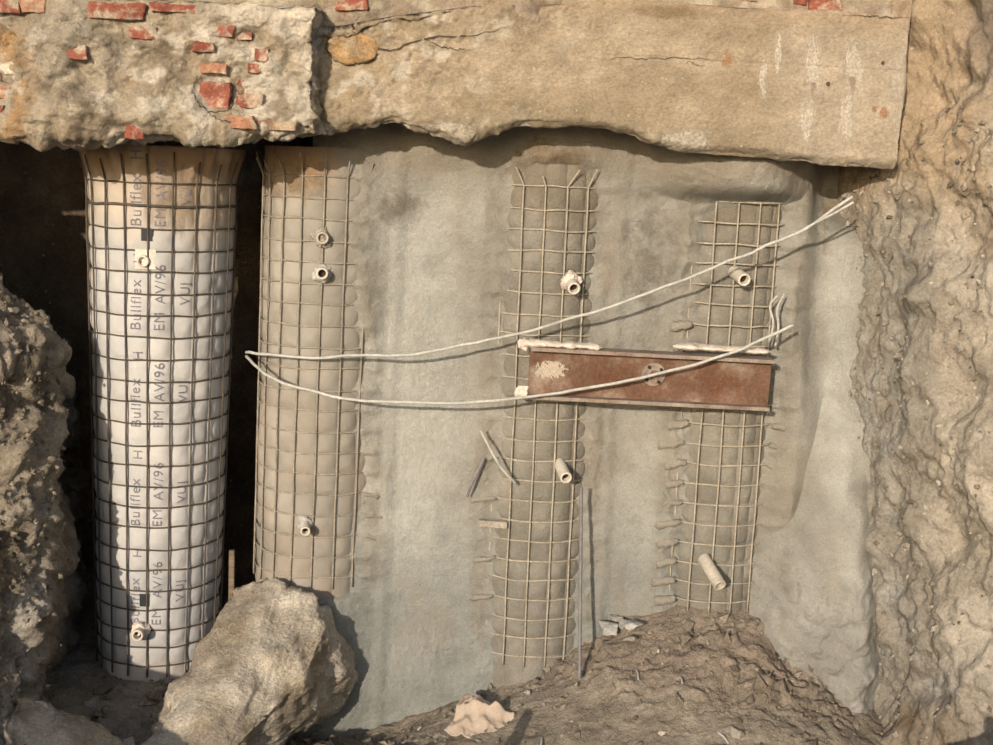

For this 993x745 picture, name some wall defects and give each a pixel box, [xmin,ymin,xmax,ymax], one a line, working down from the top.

spalling [0,0,46,14]
spalling [68,45,89,60]
spalling [88,1,197,40]
crack [378,25,514,52]
damp [759,33,782,98]
damp [803,38,821,90]
damp [838,45,866,139]
spalling [124,125,146,140]
damp [801,100,814,146]
spalling [0,141,95,489]
spalling [156,25,313,597]
spalling [81,512,97,575]